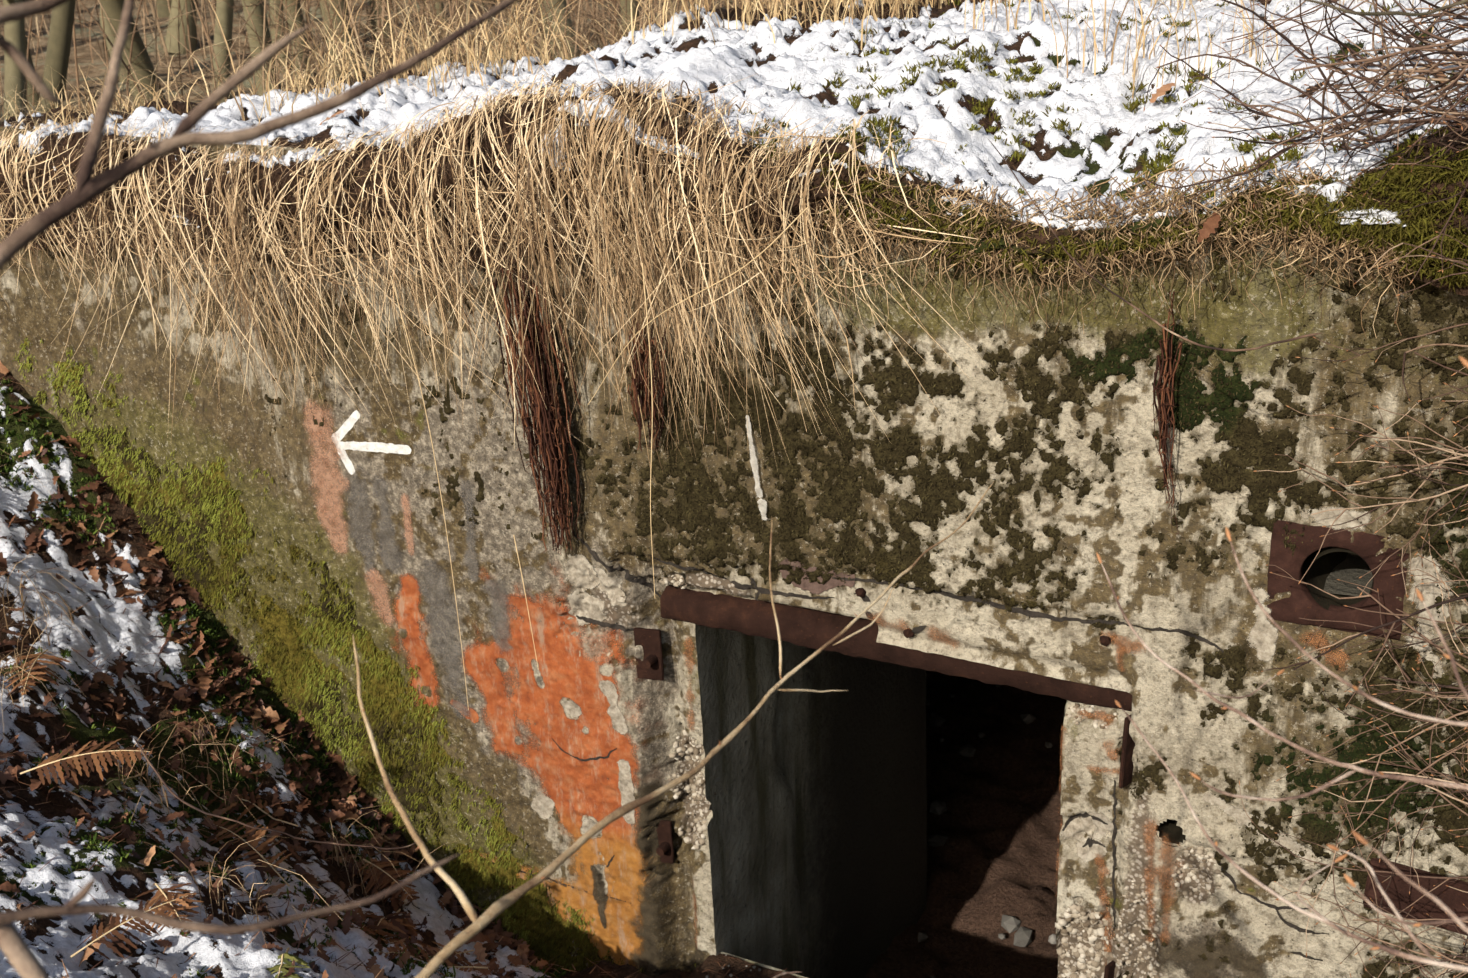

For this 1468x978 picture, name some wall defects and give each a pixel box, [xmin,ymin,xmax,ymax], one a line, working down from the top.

corrosion [930,630,956,646]
corrosion [1107,633,1142,670]
spalling [1065,703,1117,729]
peeling [395,567,652,969]
spalling [1061,812,1114,862]
spalling [1171,846,1222,900]
spalling [1055,875,1160,978]